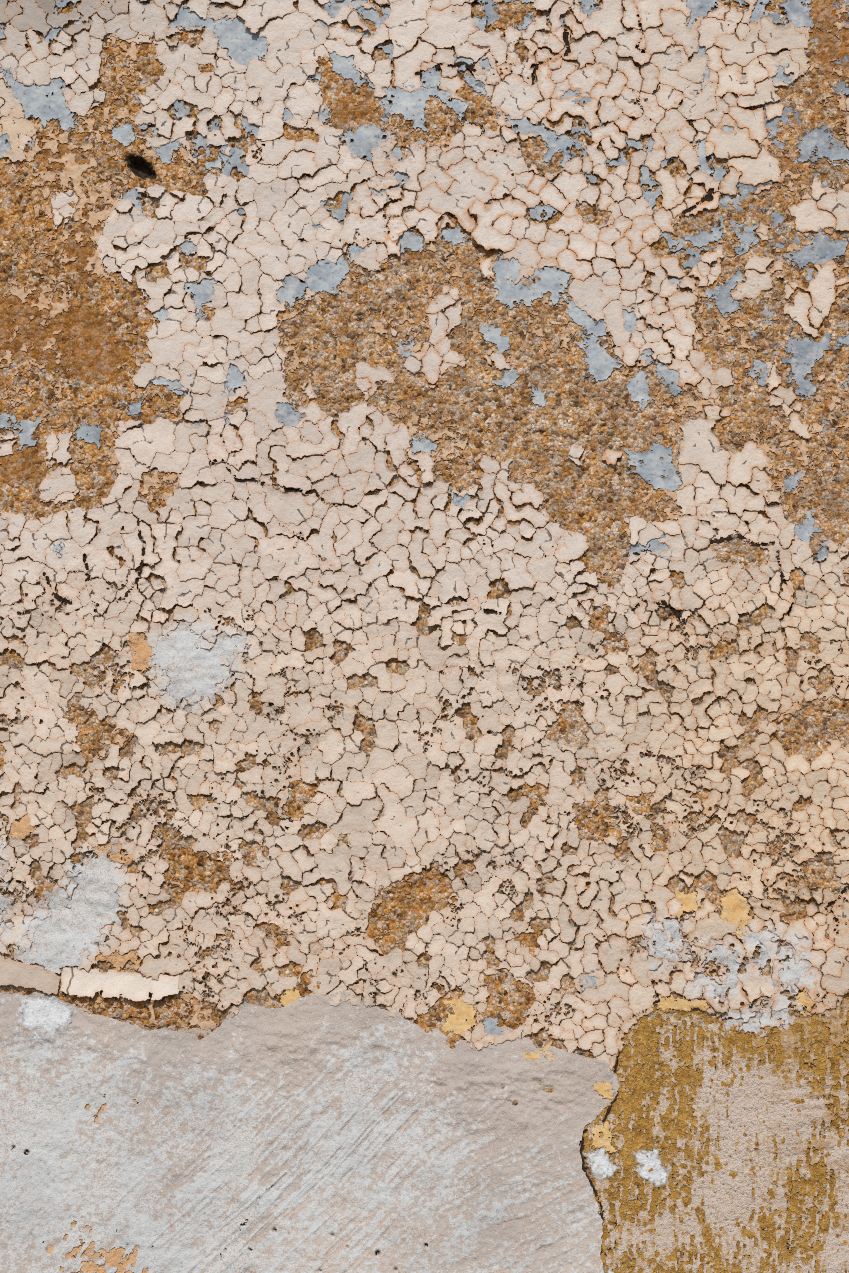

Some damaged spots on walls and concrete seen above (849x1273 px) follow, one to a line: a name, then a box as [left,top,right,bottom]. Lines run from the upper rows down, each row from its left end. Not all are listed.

crack [415,61,476,76]
crack [530,28,571,85]
crack [679,188,714,218]
crack [226,466,345,506]
flaking render [0,0,849,1010]
crack [43,554,90,605]
crack [117,517,146,602]
crack [462,598,502,615]
crack [631,600,685,622]
crack [710,534,794,628]
peeling [53,577,651,1092]
peeling [552,685,849,1273]